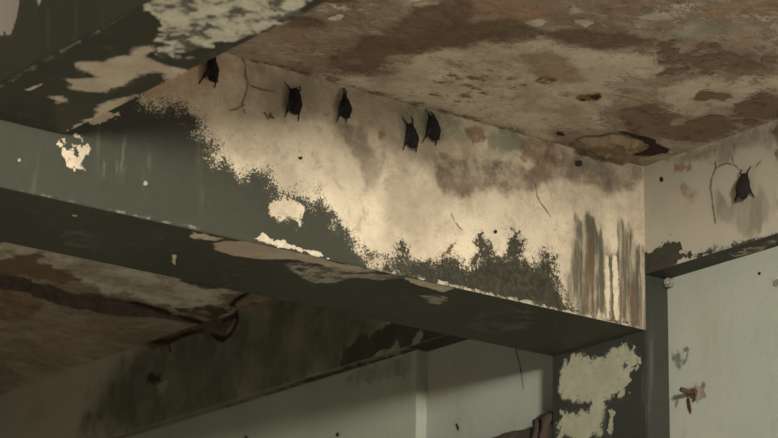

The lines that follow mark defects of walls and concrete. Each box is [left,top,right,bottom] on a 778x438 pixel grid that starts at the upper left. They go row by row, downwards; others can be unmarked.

flaking render [0,0,24,36]
damp [331,2,650,76]
peeling [49,0,778,330]
damp [437,156,472,196]
damp [524,150,618,191]
flaking render [0,242,242,325]
damp [377,213,777,330]
crack [147,292,259,353]
peeling [556,343,642,438]